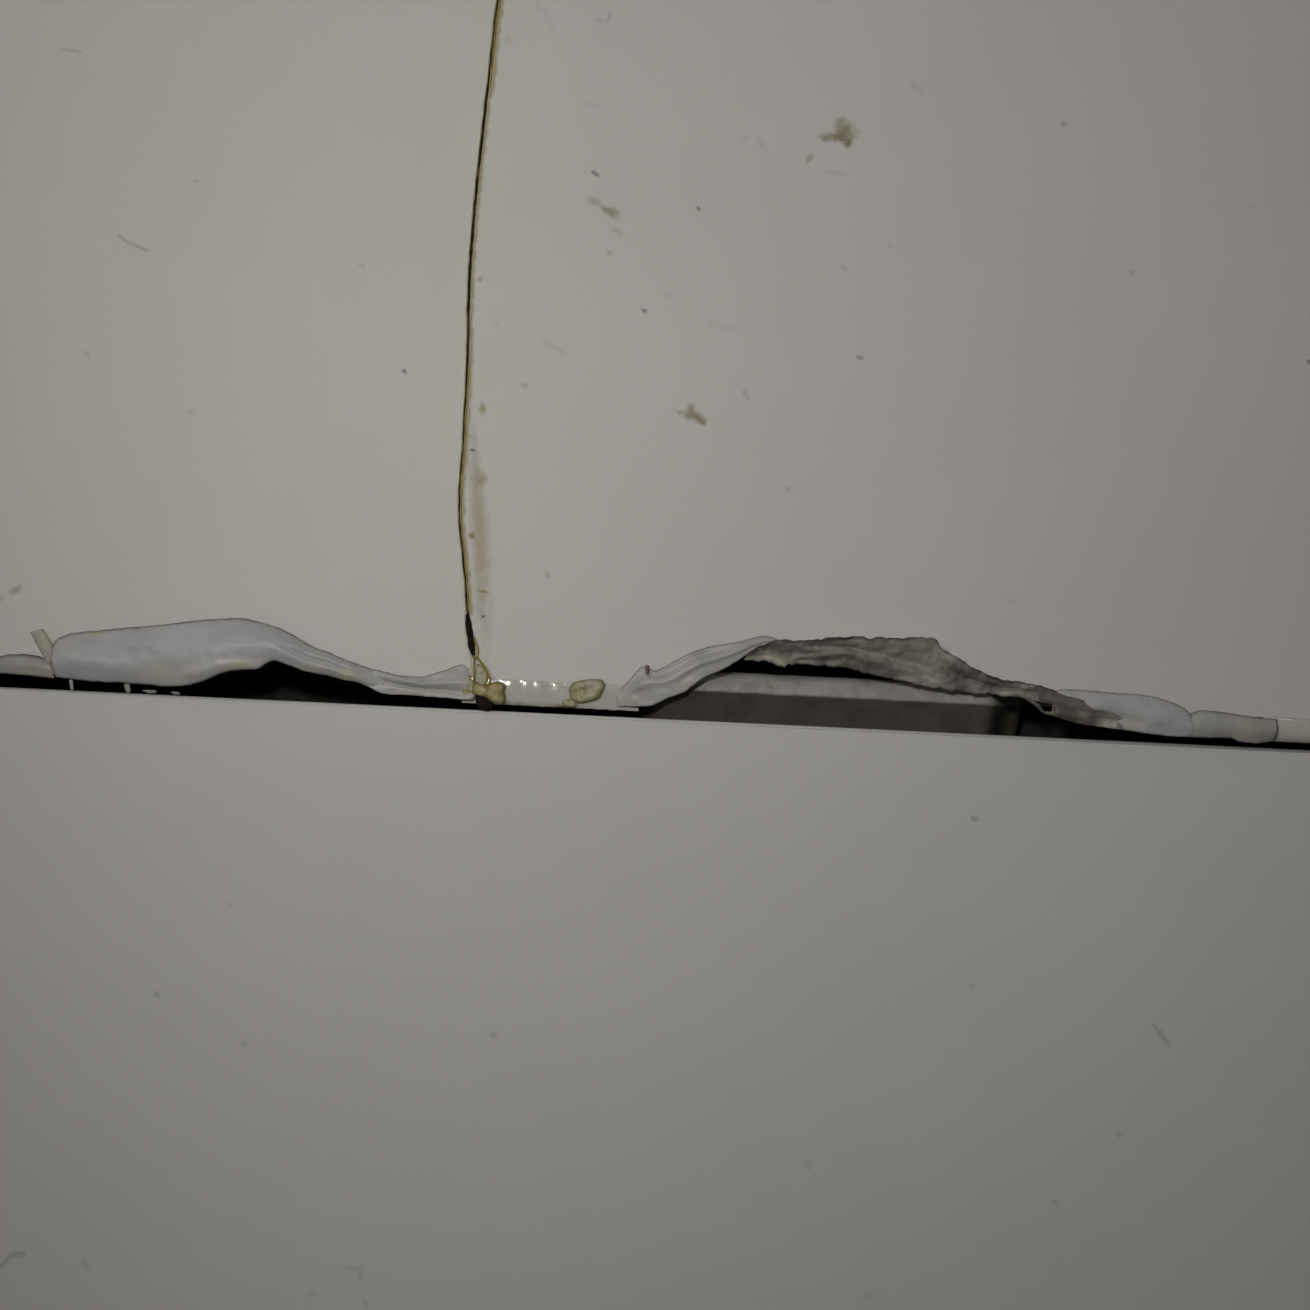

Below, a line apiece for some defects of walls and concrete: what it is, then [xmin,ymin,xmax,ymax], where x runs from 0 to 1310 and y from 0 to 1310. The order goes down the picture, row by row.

crack [456,0,502,685]
peeling [616,636,1278,744]